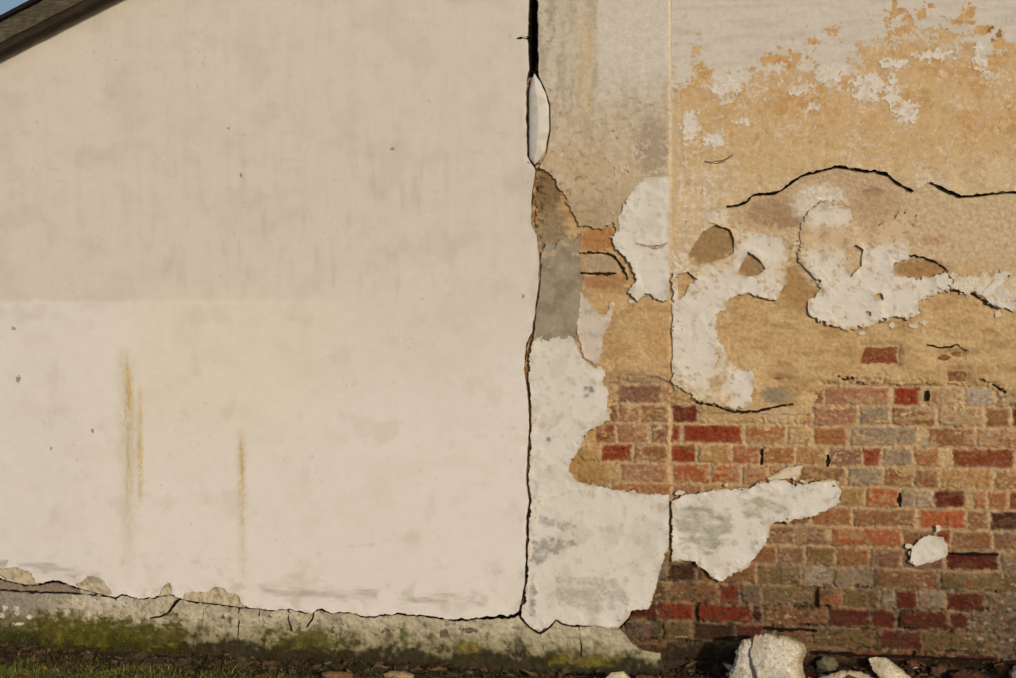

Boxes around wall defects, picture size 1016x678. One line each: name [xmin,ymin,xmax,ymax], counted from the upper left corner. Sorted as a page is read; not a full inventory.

crack [517,0,551,206]
peeling [677,0,1016,171]
crack [727,165,1016,207]
peeling [609,175,1016,411]
flaking render [0,567,39,585]
flaking render [77,576,112,596]
flaking render [159,582,246,624]
crack [0,431,585,656]
peeling [521,292,842,632]
peeling [905,525,948,566]